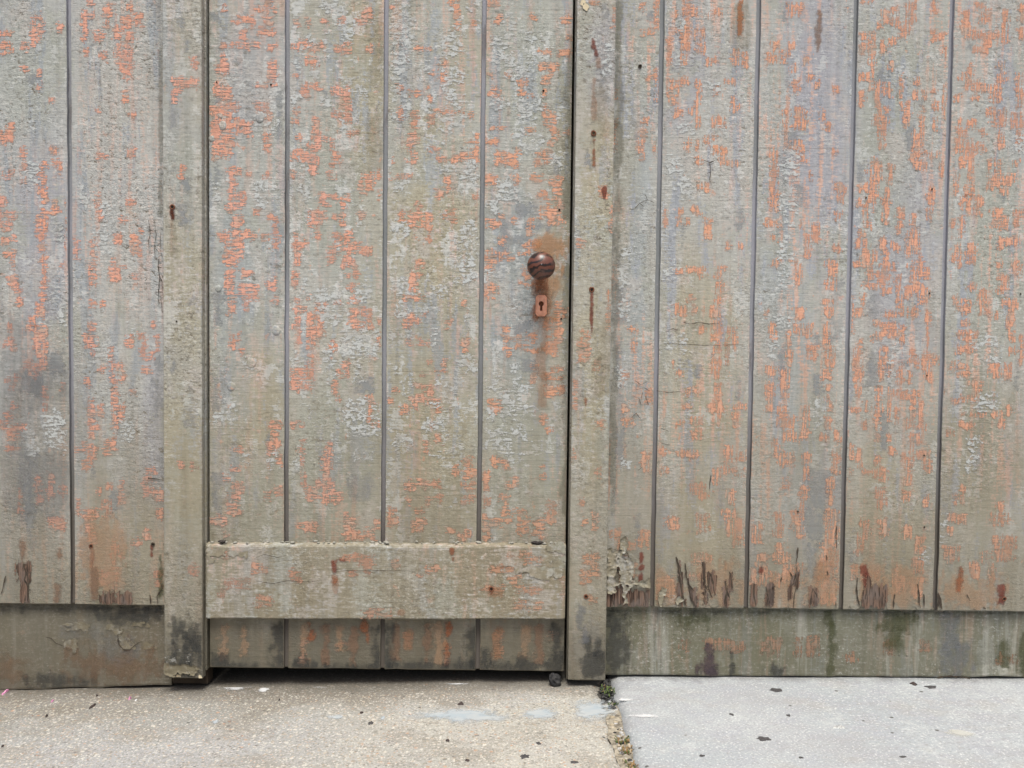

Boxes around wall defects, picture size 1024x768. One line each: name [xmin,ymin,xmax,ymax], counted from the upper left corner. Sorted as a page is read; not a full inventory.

peeling [0,15,65,104]
peeling [79,0,144,118]
peeling [636,0,749,240]
peeling [0,121,175,473]
peeling [170,0,579,613]
rust [531,232,564,319]
peeling [597,244,747,473]
peeling [688,0,1024,606]
peeling [16,471,127,547]
peeling [579,497,684,607]
water stain [695,643,734,677]
water stain [825,611,836,676]